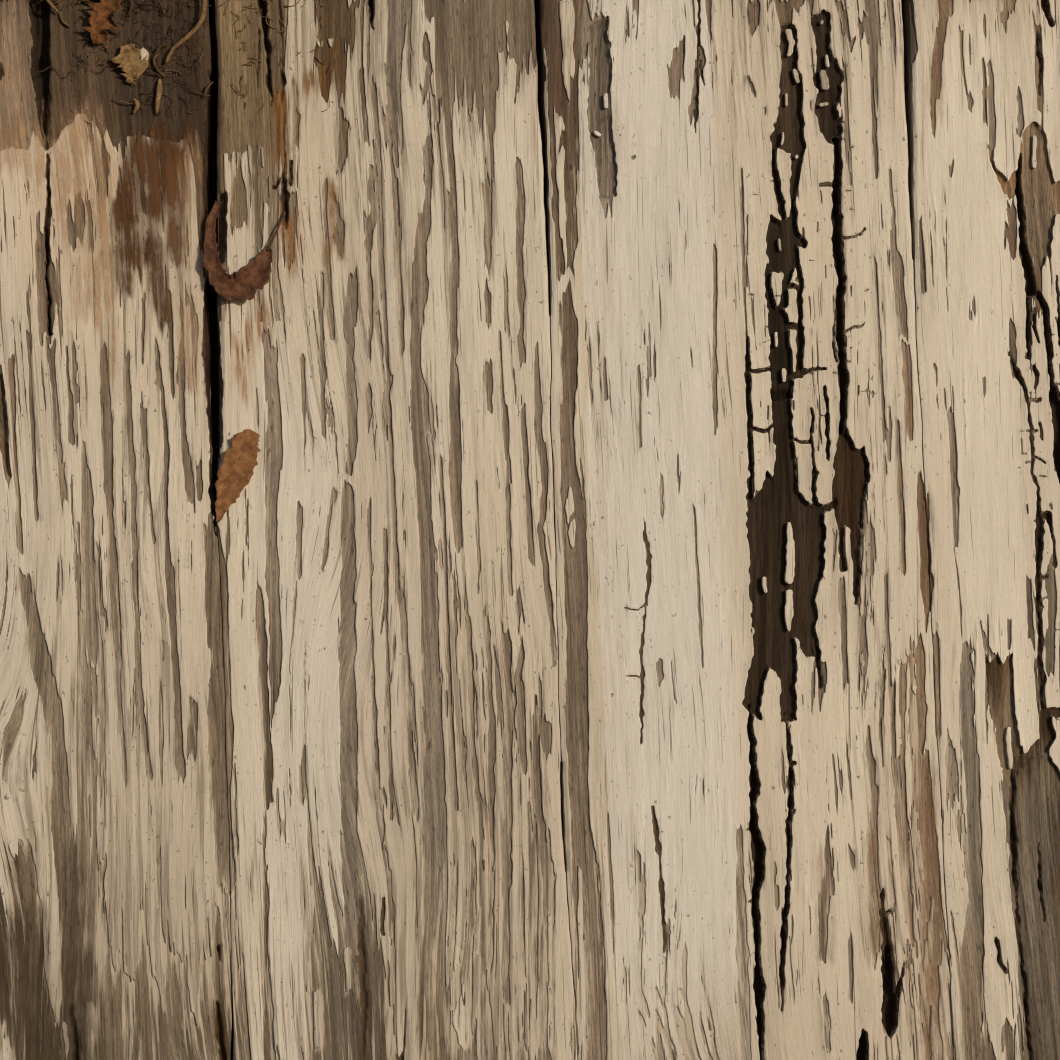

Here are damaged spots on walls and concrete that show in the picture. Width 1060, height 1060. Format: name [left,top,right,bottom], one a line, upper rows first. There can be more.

peeling [0,373,11,477]
crack [201,72,216,536]
peeling [587,17,617,200]
peeling [742,11,869,721]
crack [1008,154,1060,710]
crack [747,703,796,1060]
peeling [985,654,1060,1060]